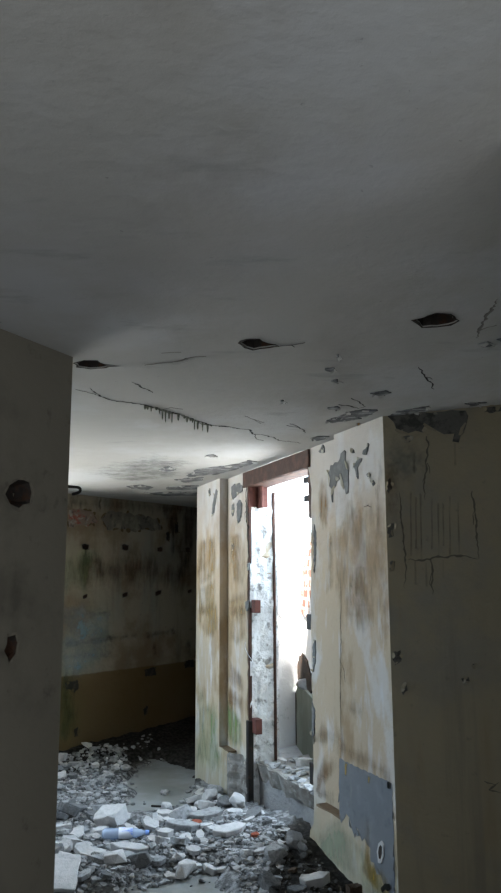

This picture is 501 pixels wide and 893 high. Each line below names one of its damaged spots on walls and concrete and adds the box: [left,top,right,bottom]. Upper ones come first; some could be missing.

crack [476,301,497,338]
crack [147,352,206,365]
crack [75,382,306,443]
flaking render [126,454,258,523]
flaking render [310,436,329,453]
flaking render [326,443,375,502]
flaking render [325,406,378,424]
flaking render [388,402,501,443]
crack [399,492,479,592]
water stain [96,515,217,634]
peeling [338,758,395,893]